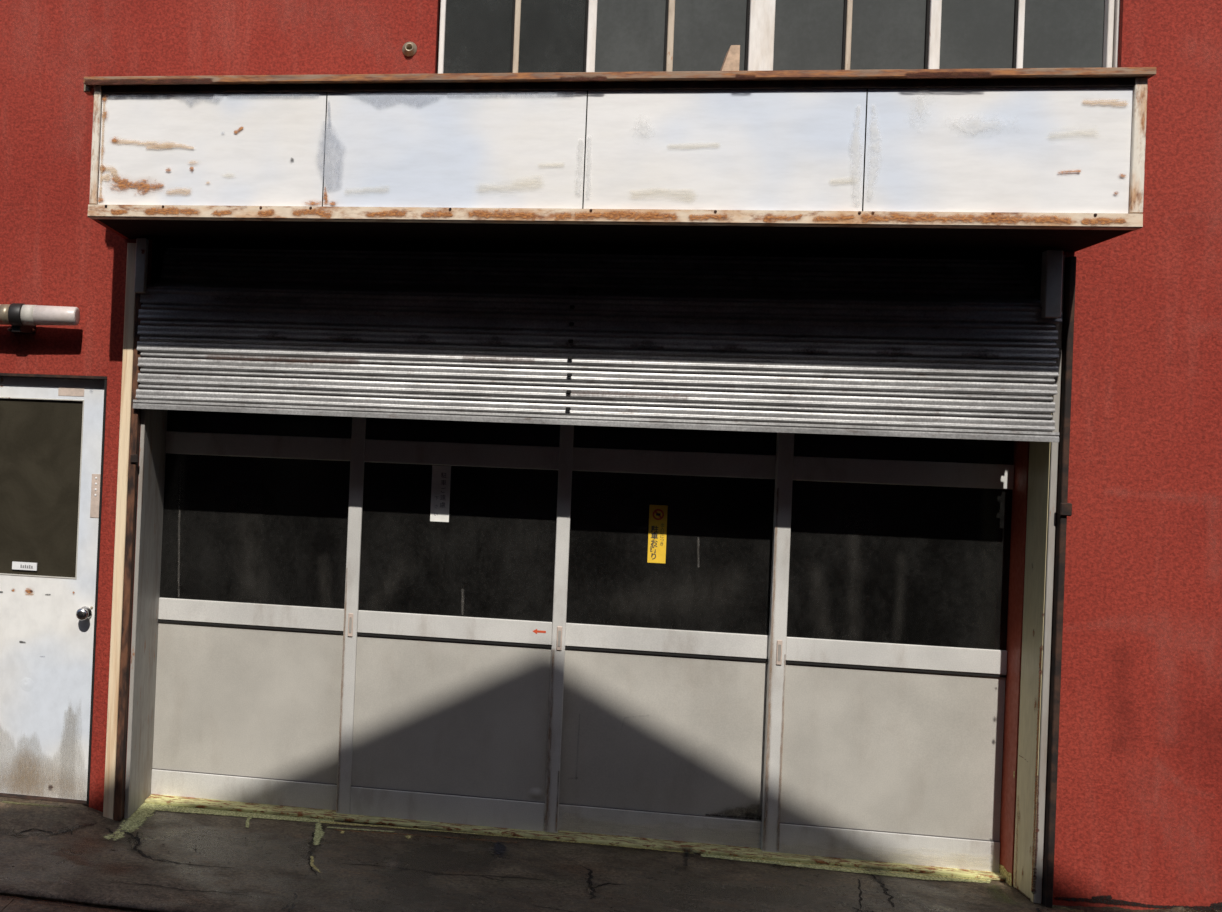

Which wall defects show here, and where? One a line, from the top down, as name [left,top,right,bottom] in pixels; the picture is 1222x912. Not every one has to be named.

rust [84,78,232,216]
rust [292,188,335,218]
rust [468,209,535,220]
rust [555,211,727,220]
rust [763,213,1126,225]
crack [8,823,253,897]
crack [308,825,624,912]
crack [853,874,895,912]